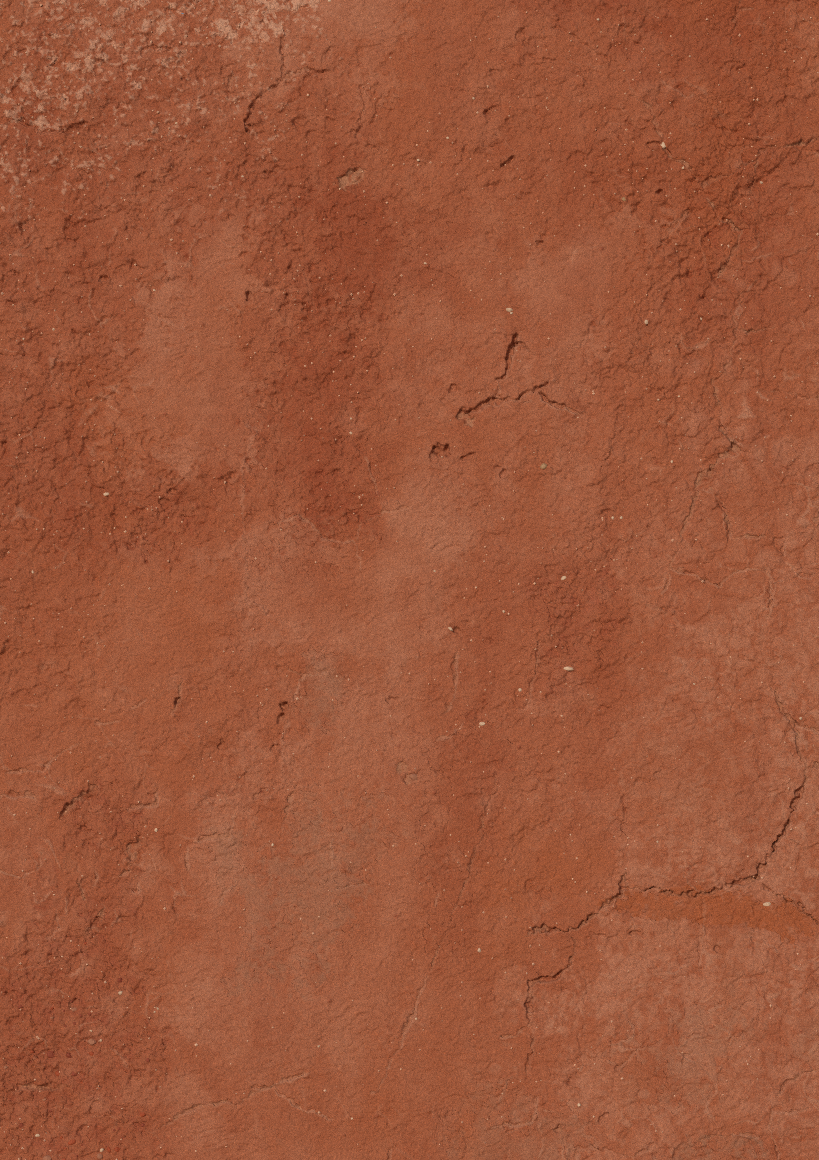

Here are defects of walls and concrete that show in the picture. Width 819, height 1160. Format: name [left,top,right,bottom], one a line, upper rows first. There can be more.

crack [469,333,581,414]
crack [678,688,819,898]
crack [500,875,627,1061]